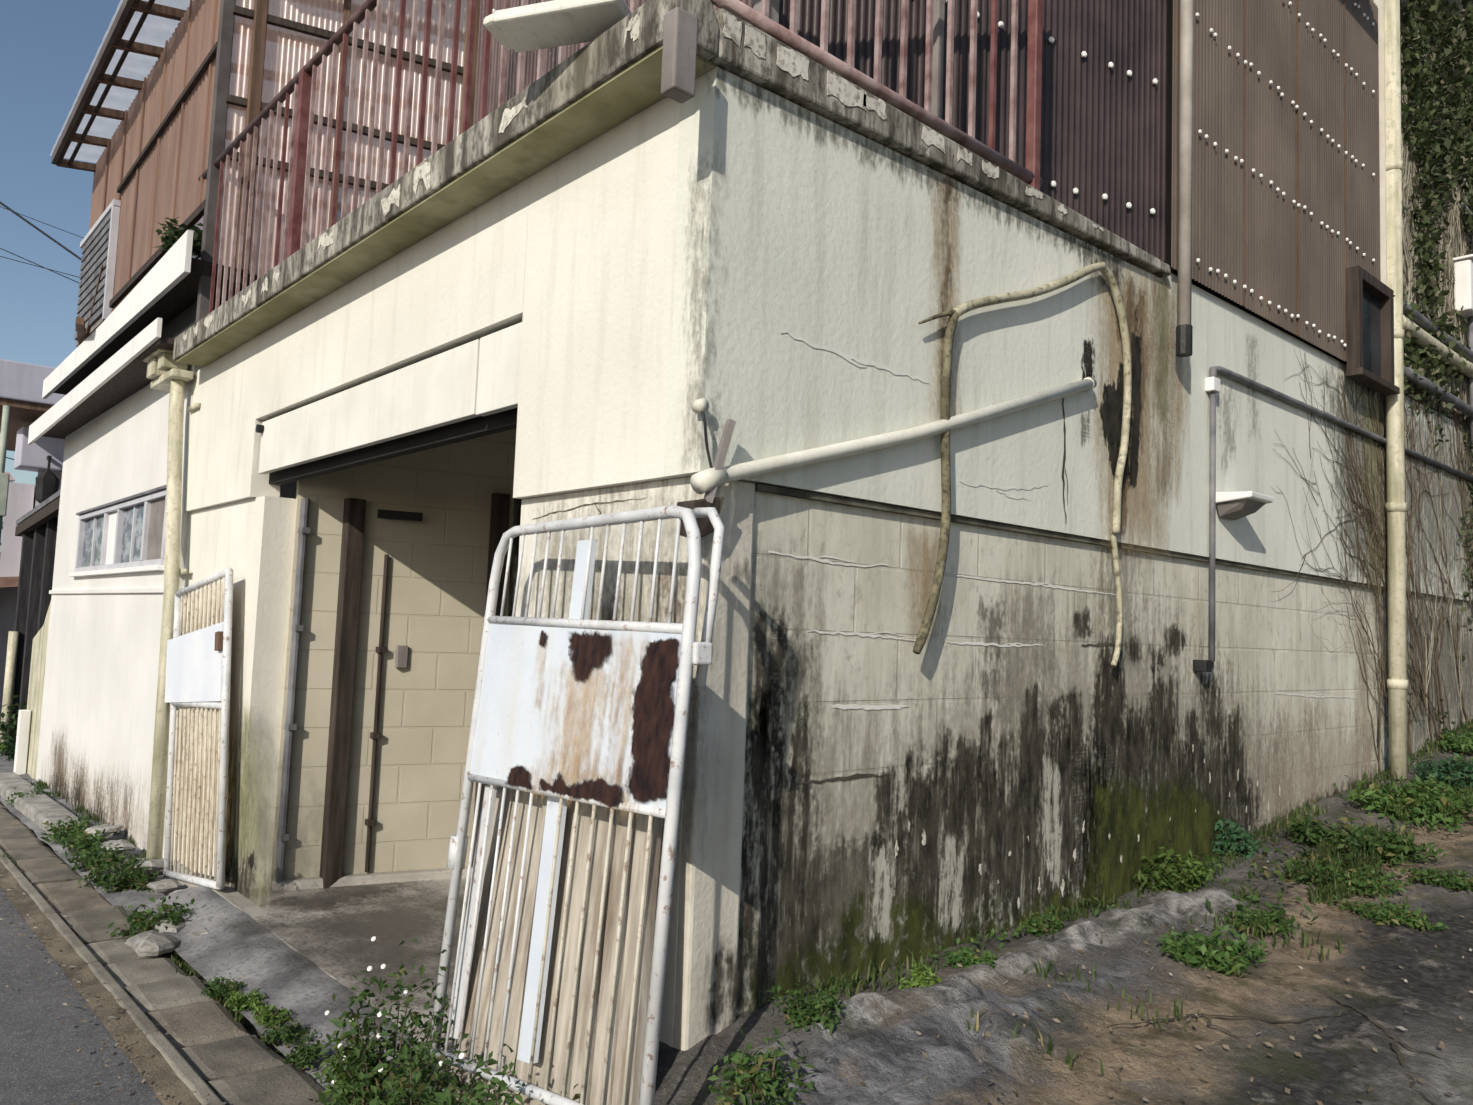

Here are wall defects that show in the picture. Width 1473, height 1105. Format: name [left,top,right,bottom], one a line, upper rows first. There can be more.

peeling [623,11,640,48]
peeling [722,12,809,81]
peeling [499,97,528,133]
peeling [827,70,887,120]
peeling [922,127,999,179]
peeling [381,162,431,217]
peeling [1026,186,1068,214]
rust [937,185,957,385]
crack [960,398,1068,519]
water stain [533,520,685,623]
water stain [704,64,1279,1025]
water stain [49,735,130,837]